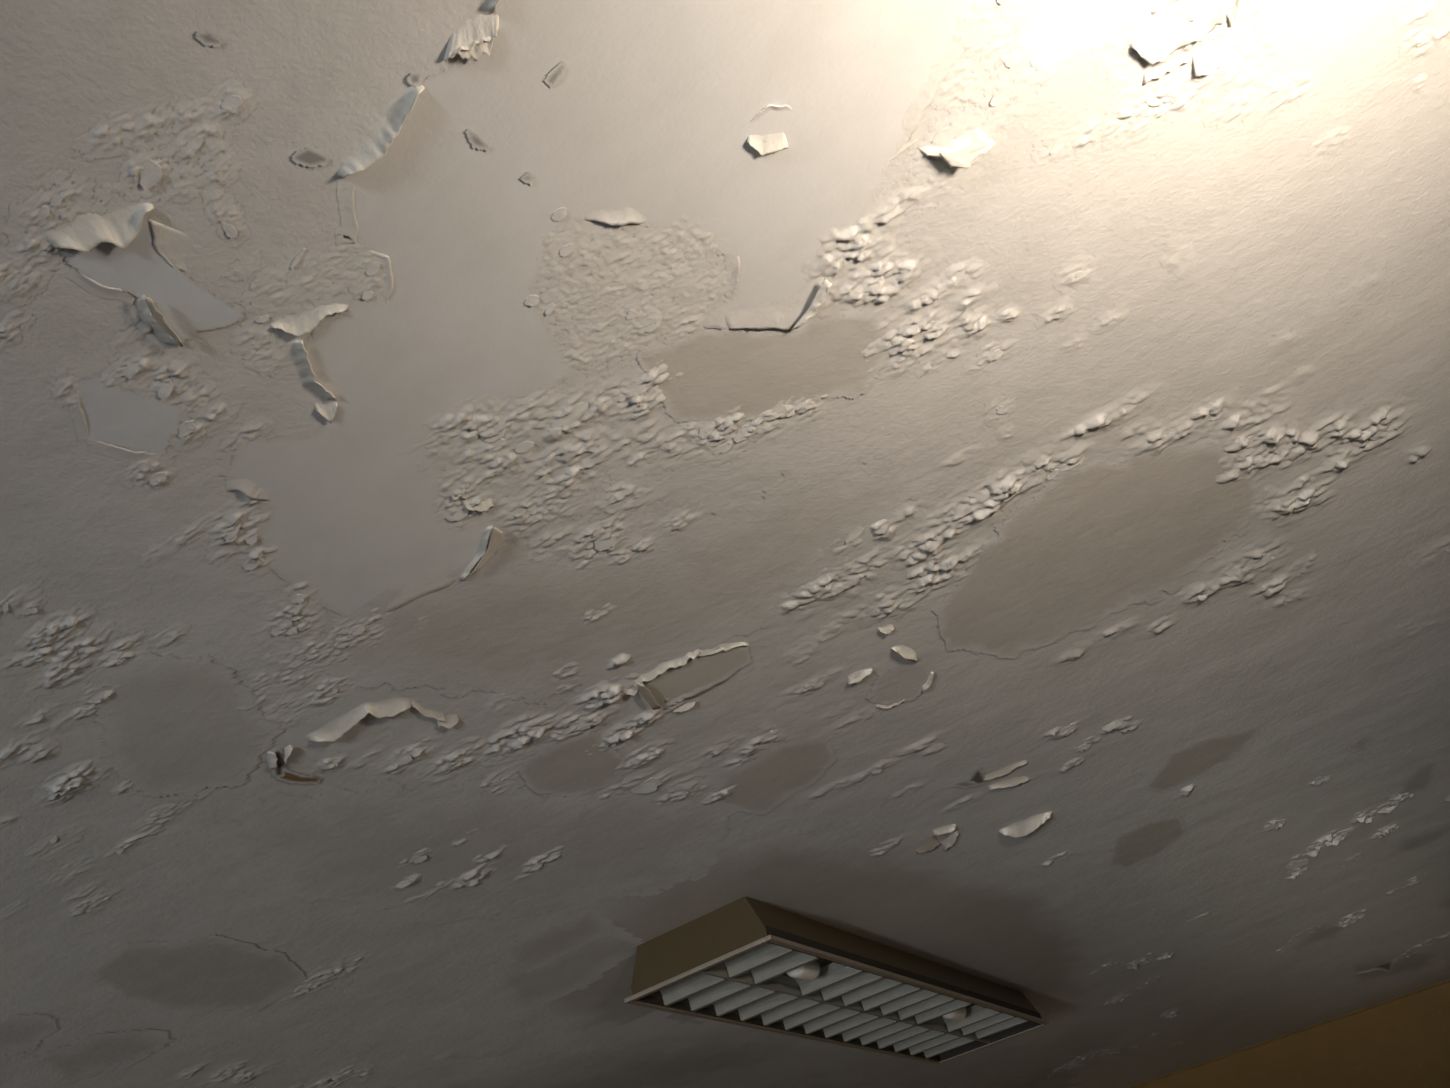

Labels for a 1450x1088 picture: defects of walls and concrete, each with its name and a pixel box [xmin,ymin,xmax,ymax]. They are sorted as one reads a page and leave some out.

peeling [1130,0,1240,107]
peeling [42,203,245,347]
peeling [220,0,995,617]
leakage [304,445,922,710]
peeling [624,642,752,712]
leakage [232,774,1159,1088]
leakage [0,1013,175,1084]